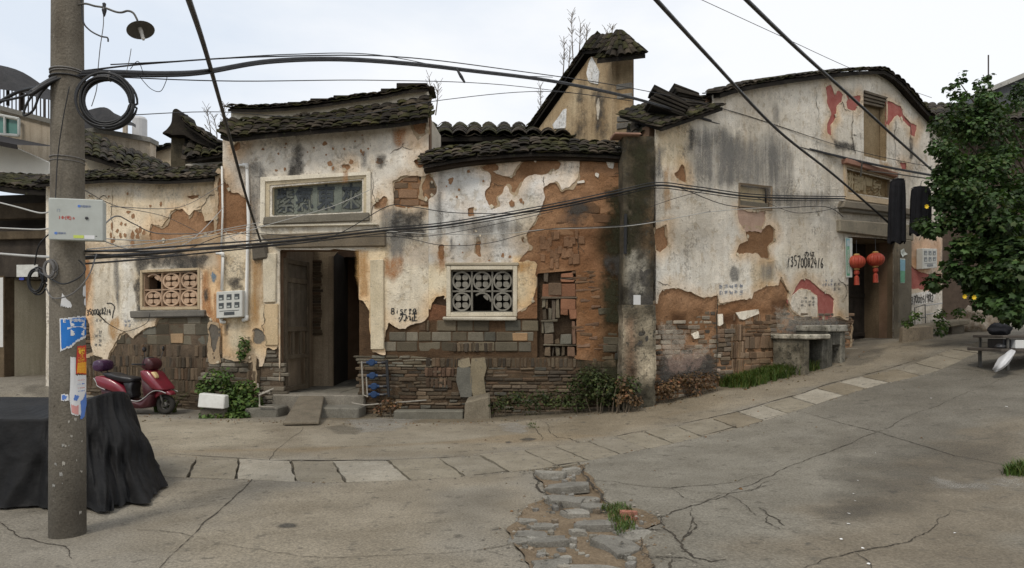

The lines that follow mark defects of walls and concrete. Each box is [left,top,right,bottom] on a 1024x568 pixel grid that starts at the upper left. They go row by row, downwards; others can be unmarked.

peeling [825,83,860,135]
peeling [885,99,916,137]
peeling [110,168,247,247]
peeling [674,165,686,182]
peeling [736,208,776,260]
water stain [690,129,824,206]
peeling [353,156,619,414]
water stain [629,268,653,305]
peeling [653,276,854,403]
crack [530,367,1016,568]